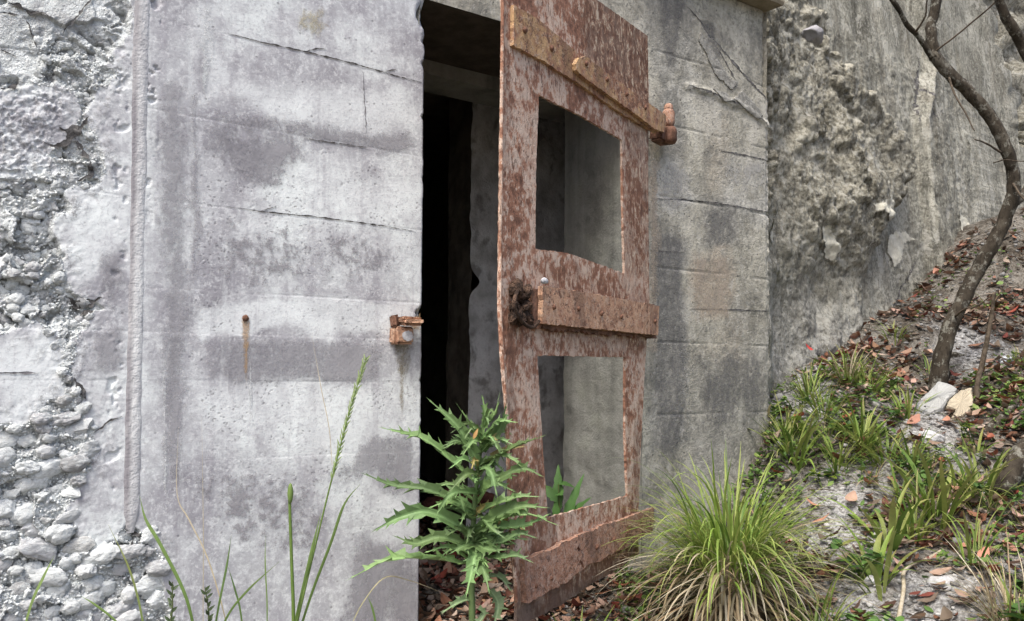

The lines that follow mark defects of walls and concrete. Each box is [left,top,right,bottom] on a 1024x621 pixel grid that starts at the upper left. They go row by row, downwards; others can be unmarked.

crack [689,8,769,125]
leakage [209,113,412,185]
peeling [822,224,842,264]
peeling [873,194,916,267]
spalling [0,0,174,621]
corrosion [242,321,252,406]
leakage [210,340,376,383]